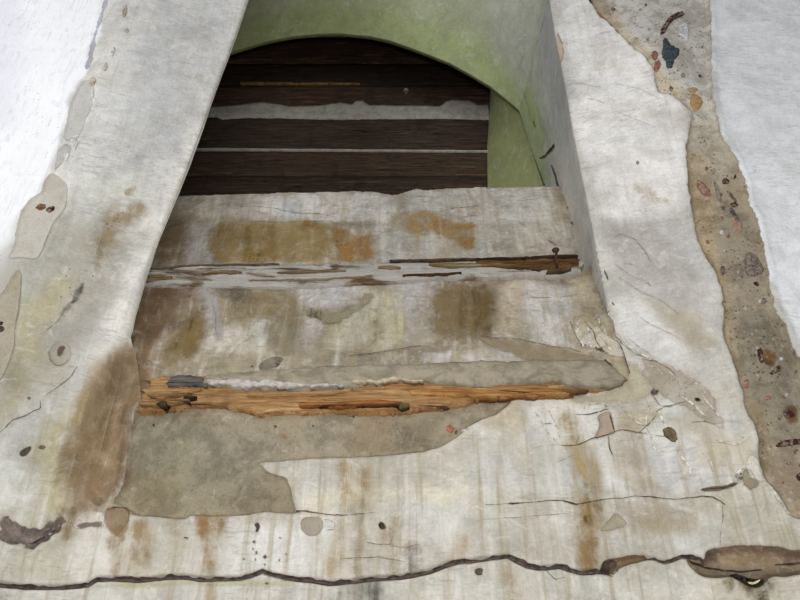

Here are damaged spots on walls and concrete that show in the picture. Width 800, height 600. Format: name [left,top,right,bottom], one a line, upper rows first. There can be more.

flaking render [9,0,108,259]
corrosion [215,221,370,262]
flaking render [570,0,800,519]
damp [432,284,492,334]
flaking render [251,357,283,370]
crack [479,335,630,378]
damp [69,349,140,499]
crack [535,401,685,463]
flaking render [0,401,511,561]
crack [485,482,737,545]
crack [0,539,613,590]
crack [643,554,704,566]